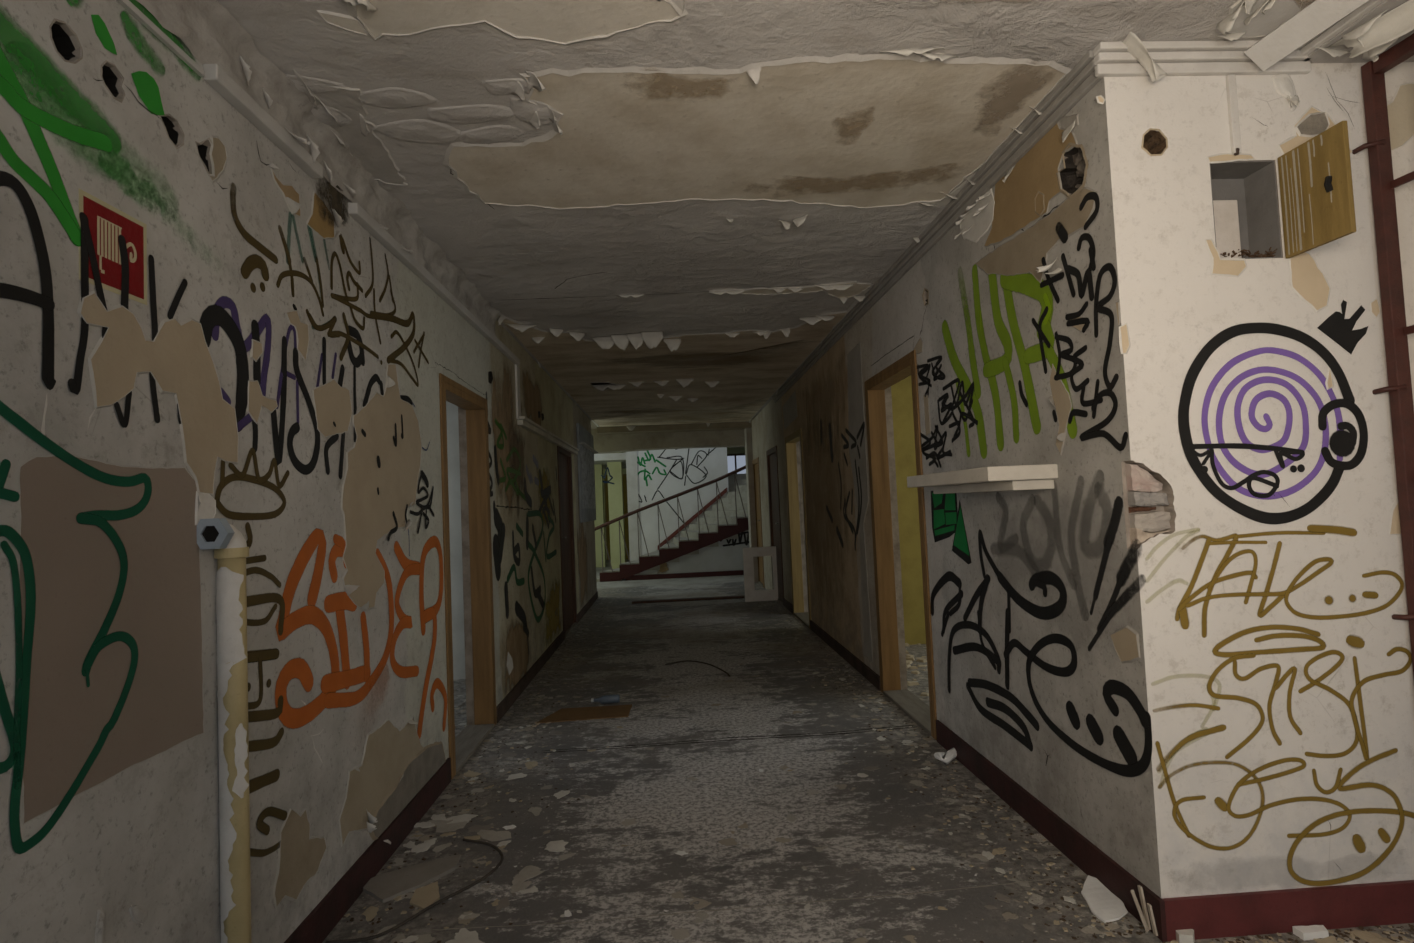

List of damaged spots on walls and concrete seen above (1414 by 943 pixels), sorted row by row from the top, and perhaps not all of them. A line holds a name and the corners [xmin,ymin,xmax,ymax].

peeling [136,0,873,431]
peeling [443,47,1098,283]
leakage [981,70,1045,125]
peeling [77,290,278,525]
peeling [312,363,422,611]
spalling [1125,464,1171,544]
peeling [273,716,514,908]